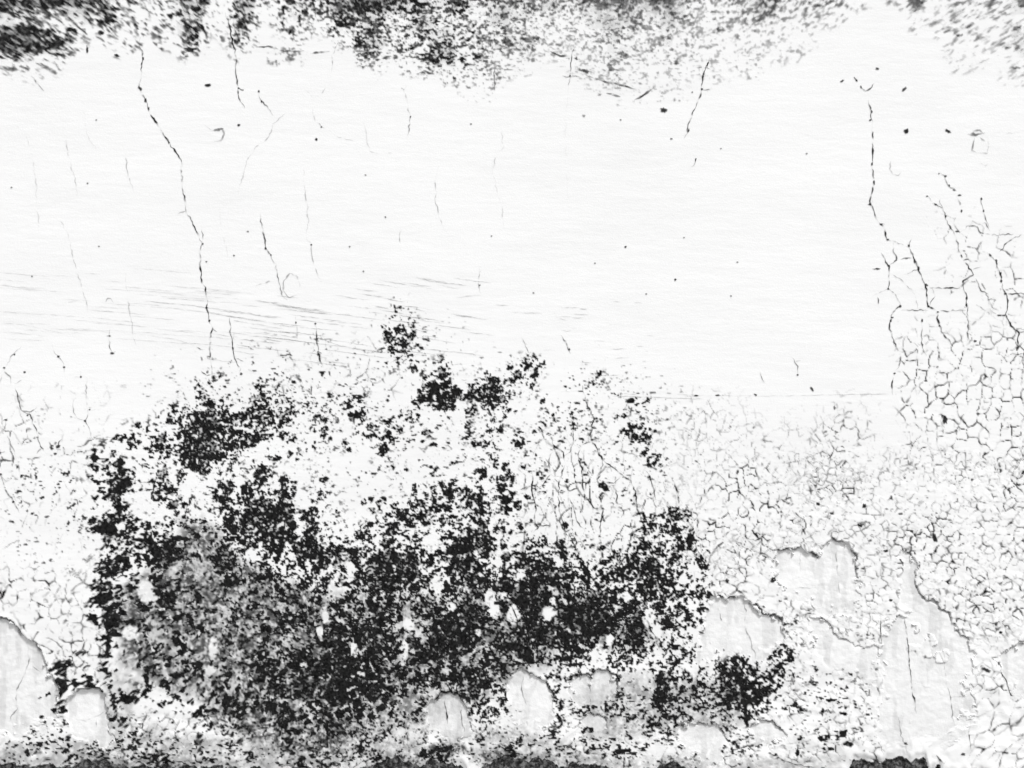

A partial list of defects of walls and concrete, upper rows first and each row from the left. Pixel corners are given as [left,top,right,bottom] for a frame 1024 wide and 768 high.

water stain [0,0,210,74]
crack [138,49,182,161]
water stain [221,0,724,87]
water stain [727,0,843,22]
crack [183,194,242,375]
crack [854,77,1024,701]
mould [2,305,872,768]
crack [522,402,860,597]
flaking render [0,617,116,751]
flaking render [678,721,729,765]
flaking render [693,595,786,672]
flaking render [771,537,1024,755]